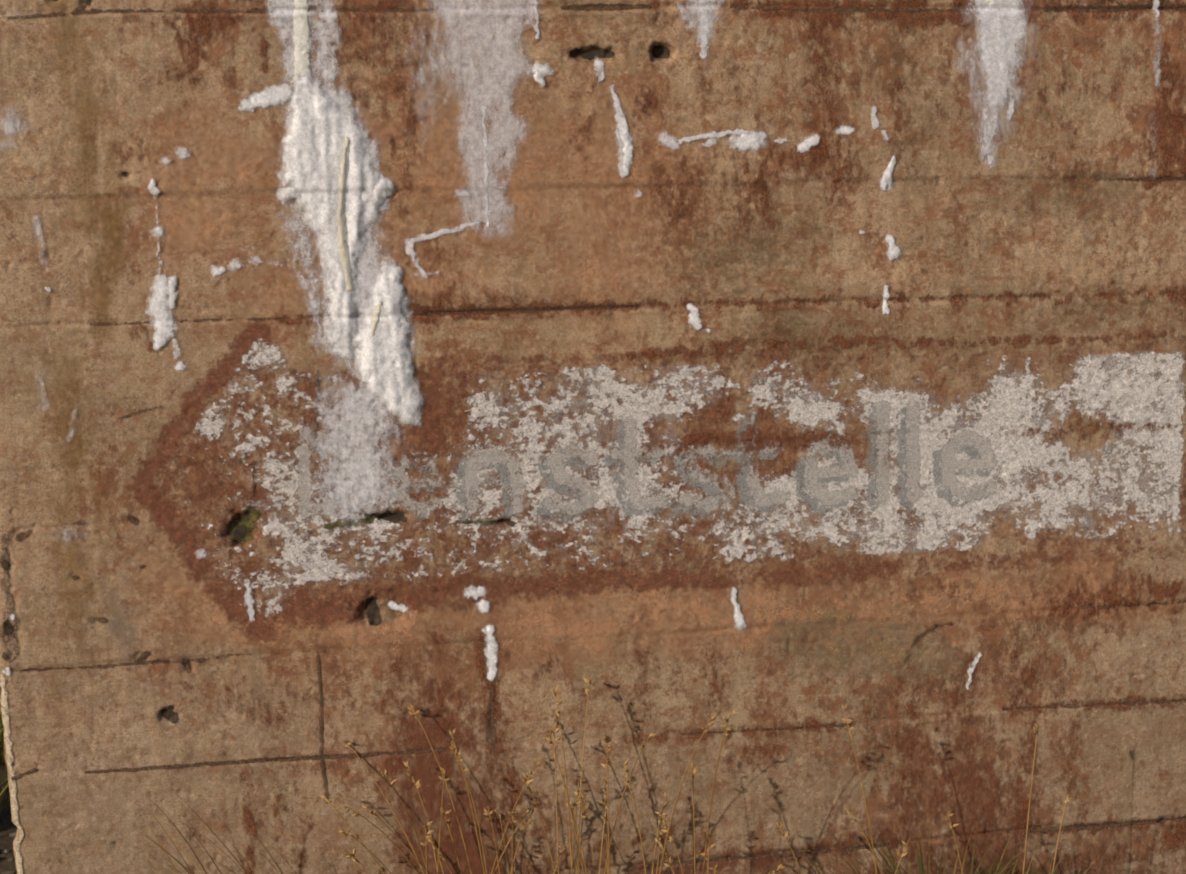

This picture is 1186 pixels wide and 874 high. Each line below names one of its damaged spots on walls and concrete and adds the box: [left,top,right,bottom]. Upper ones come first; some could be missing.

spalling [569,48,614,62]
water stain [960,0,1027,164]
corrosion [1133,42,1186,190]
water stain [146,178,184,370]
water stain [238,0,423,522]
spalling [323,512,407,530]
crack [11,768,37,781]
crack [18,653,250,672]
crack [84,651,445,804]
spalling [365,596,407,626]
water stain [465,586,497,681]
corrosion [203,559,1186,874]